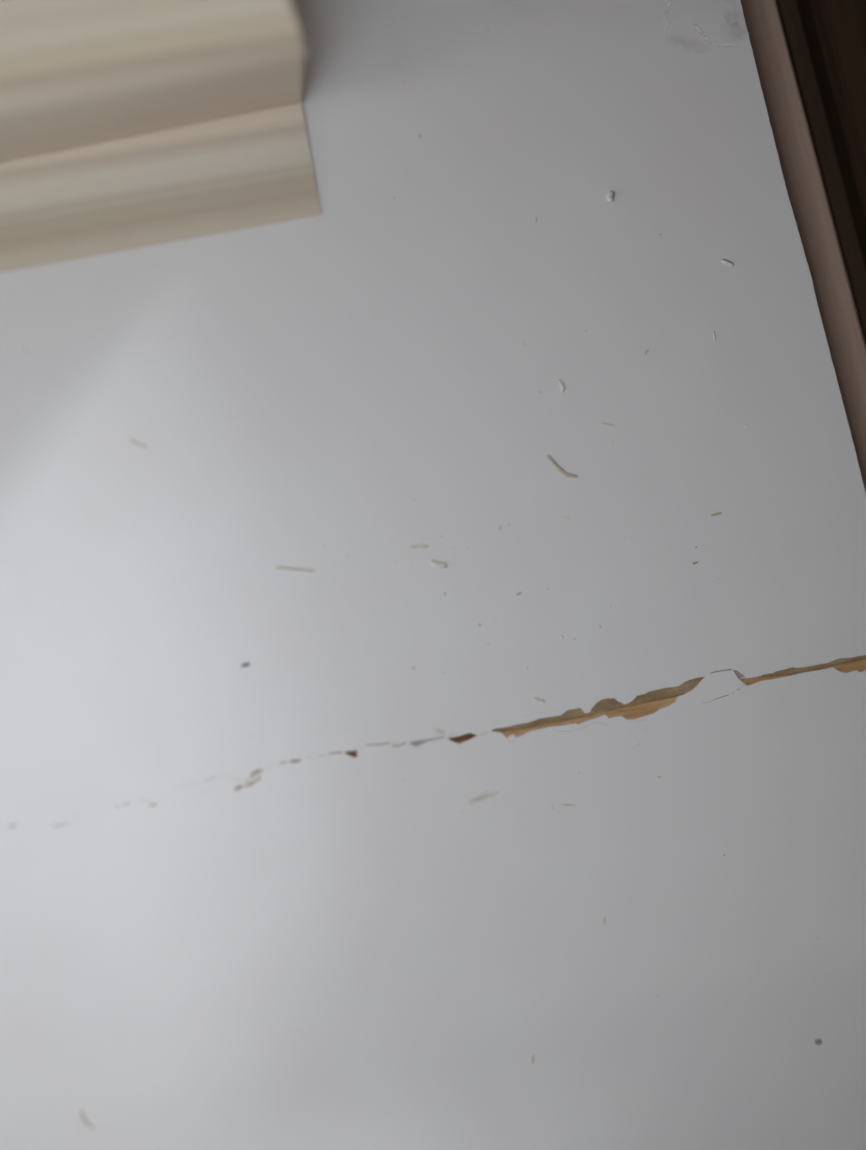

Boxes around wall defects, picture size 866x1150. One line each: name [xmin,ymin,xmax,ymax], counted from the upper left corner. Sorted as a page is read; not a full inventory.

peeling [491,655,866,740]
crack [266,732,515,768]
peeling [447,733,478,744]